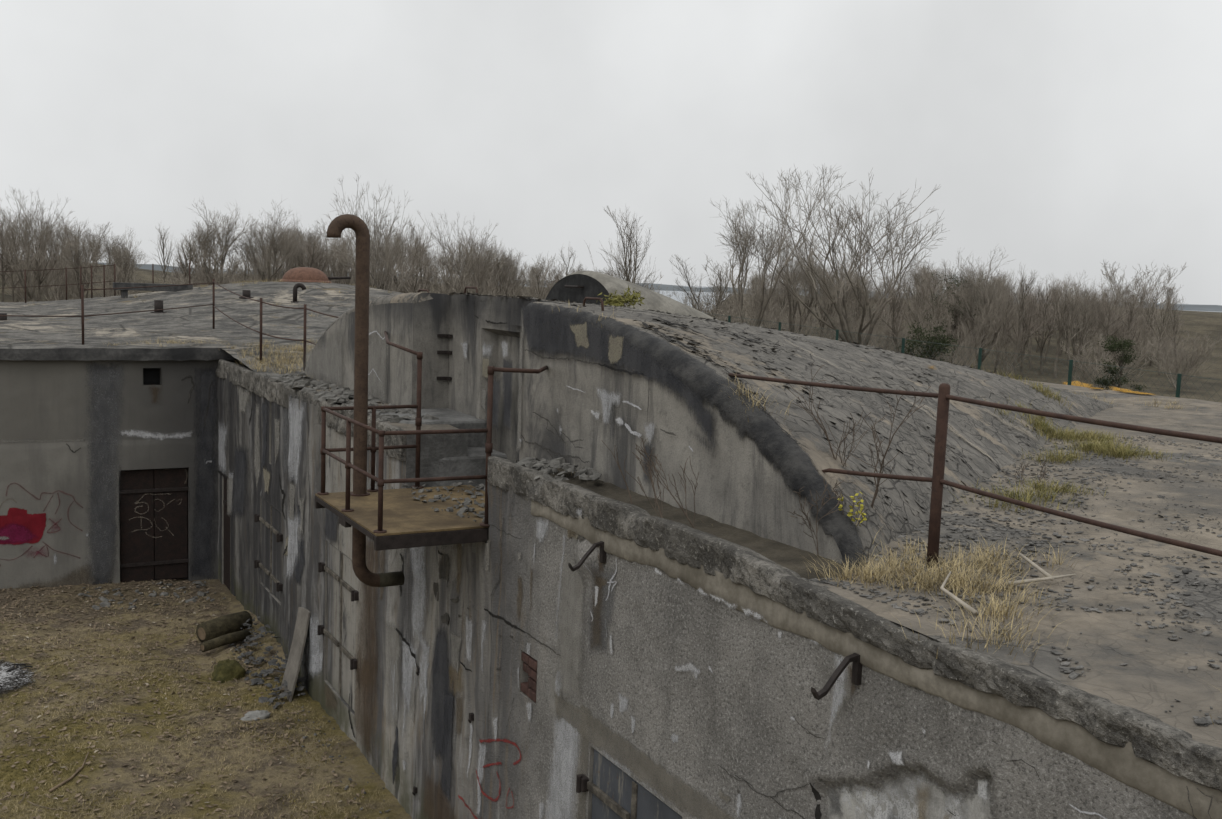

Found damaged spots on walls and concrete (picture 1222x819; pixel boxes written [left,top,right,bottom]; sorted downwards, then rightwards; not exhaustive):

leakage [481,342,512,429]
leakage [522,306,714,452]
leakage [567,386,654,481]
peeling [448,292,1222,672]
leakage [302,618,323,673]
leakage [386,545,497,814]
peeling [555,694,734,819]
crack [717,764,822,819]
flaking render [827,774,992,819]
peeling [1193,706,1222,727]